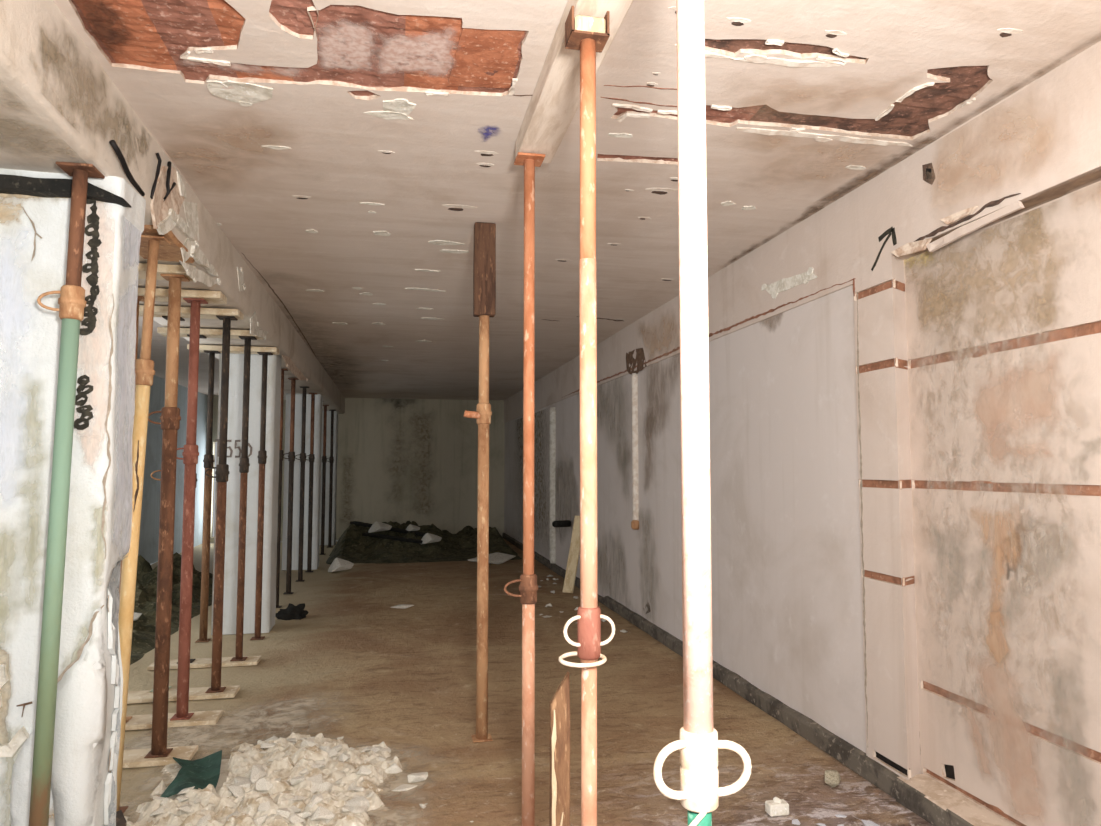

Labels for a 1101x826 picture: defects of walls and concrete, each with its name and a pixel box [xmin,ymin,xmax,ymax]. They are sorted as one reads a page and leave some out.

damp [42,33,147,159]
flaking render [71,0,527,120]
flaking render [608,103,677,138]
flaking render [727,18,751,26]
flaking render [705,30,866,67]
flaking render [706,66,990,147]
damp [0,193,39,223]
damp [0,387,42,490]
damp [0,515,38,642]
flaking render [104,557,126,826]